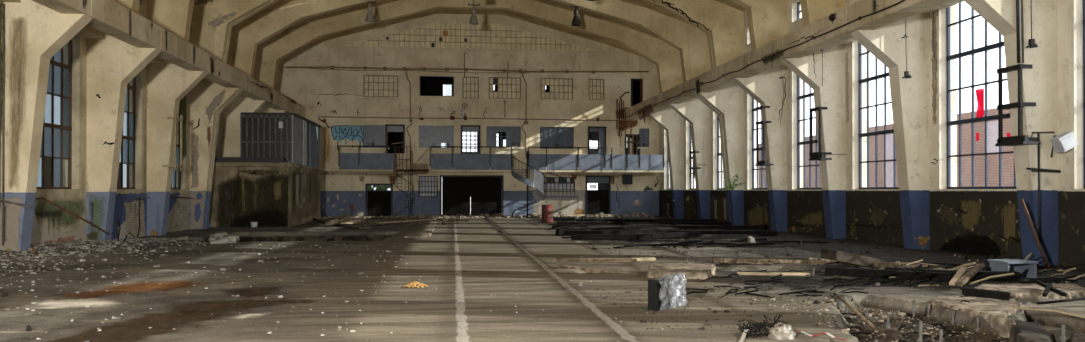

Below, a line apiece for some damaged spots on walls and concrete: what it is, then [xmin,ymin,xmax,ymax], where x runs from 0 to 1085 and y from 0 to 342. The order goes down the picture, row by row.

crack [653,0,709,30]
peeling [205,87,228,124]
flaking render [111,131,211,239]
flaking render [0,197,98,251]